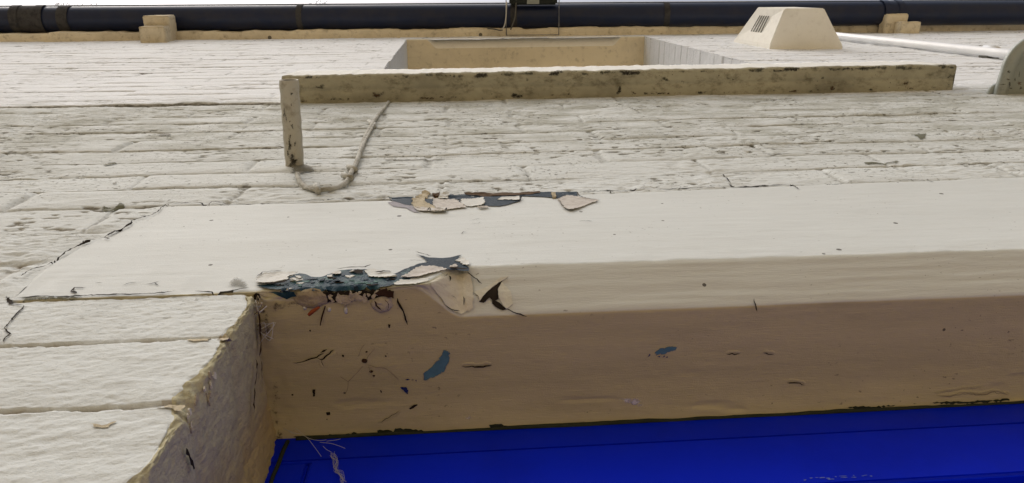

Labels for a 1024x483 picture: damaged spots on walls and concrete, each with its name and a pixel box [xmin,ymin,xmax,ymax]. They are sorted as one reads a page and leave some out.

peeling [388,190,598,213]
crack [3,201,283,342]
peeling [253,252,470,307]